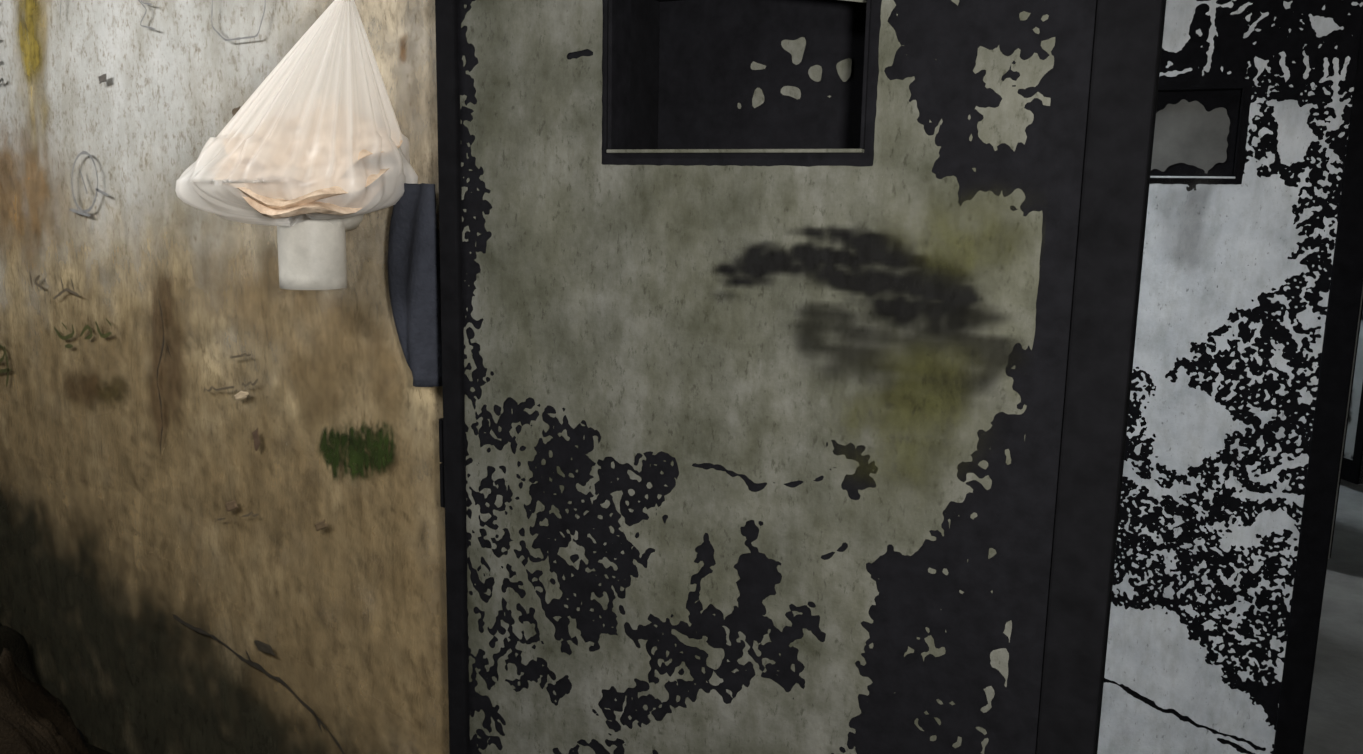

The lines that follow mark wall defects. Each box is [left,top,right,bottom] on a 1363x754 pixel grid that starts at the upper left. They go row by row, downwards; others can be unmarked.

leakage [356,0,436,96]
leakage [409,76,439,194]
leakage [0,224,446,567]
peeling [460,0,1055,754]
peeling [1097,0,1363,754]
leakage [0,483,327,754]
crack [173,615,345,754]